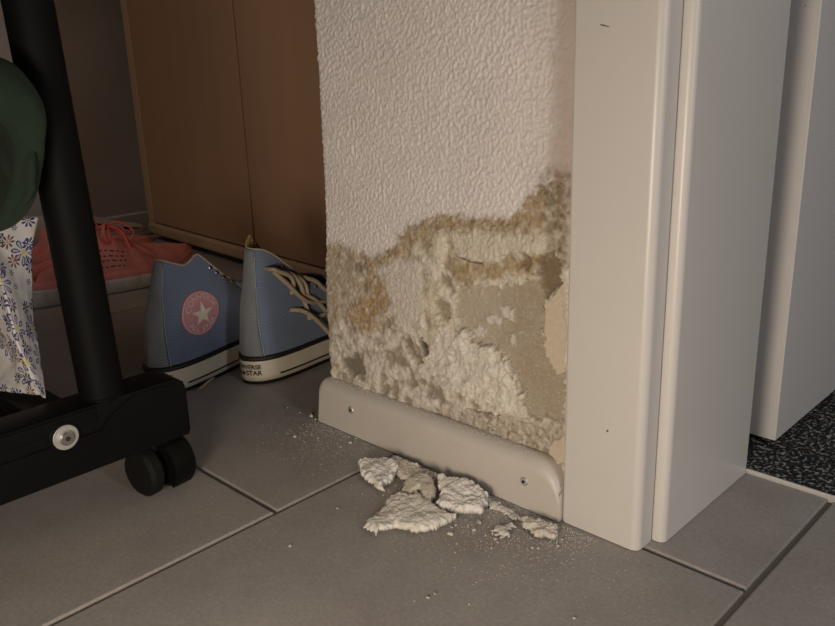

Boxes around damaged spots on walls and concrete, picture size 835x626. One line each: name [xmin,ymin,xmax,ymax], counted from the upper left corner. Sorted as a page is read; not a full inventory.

spalling [325,173,570,466]